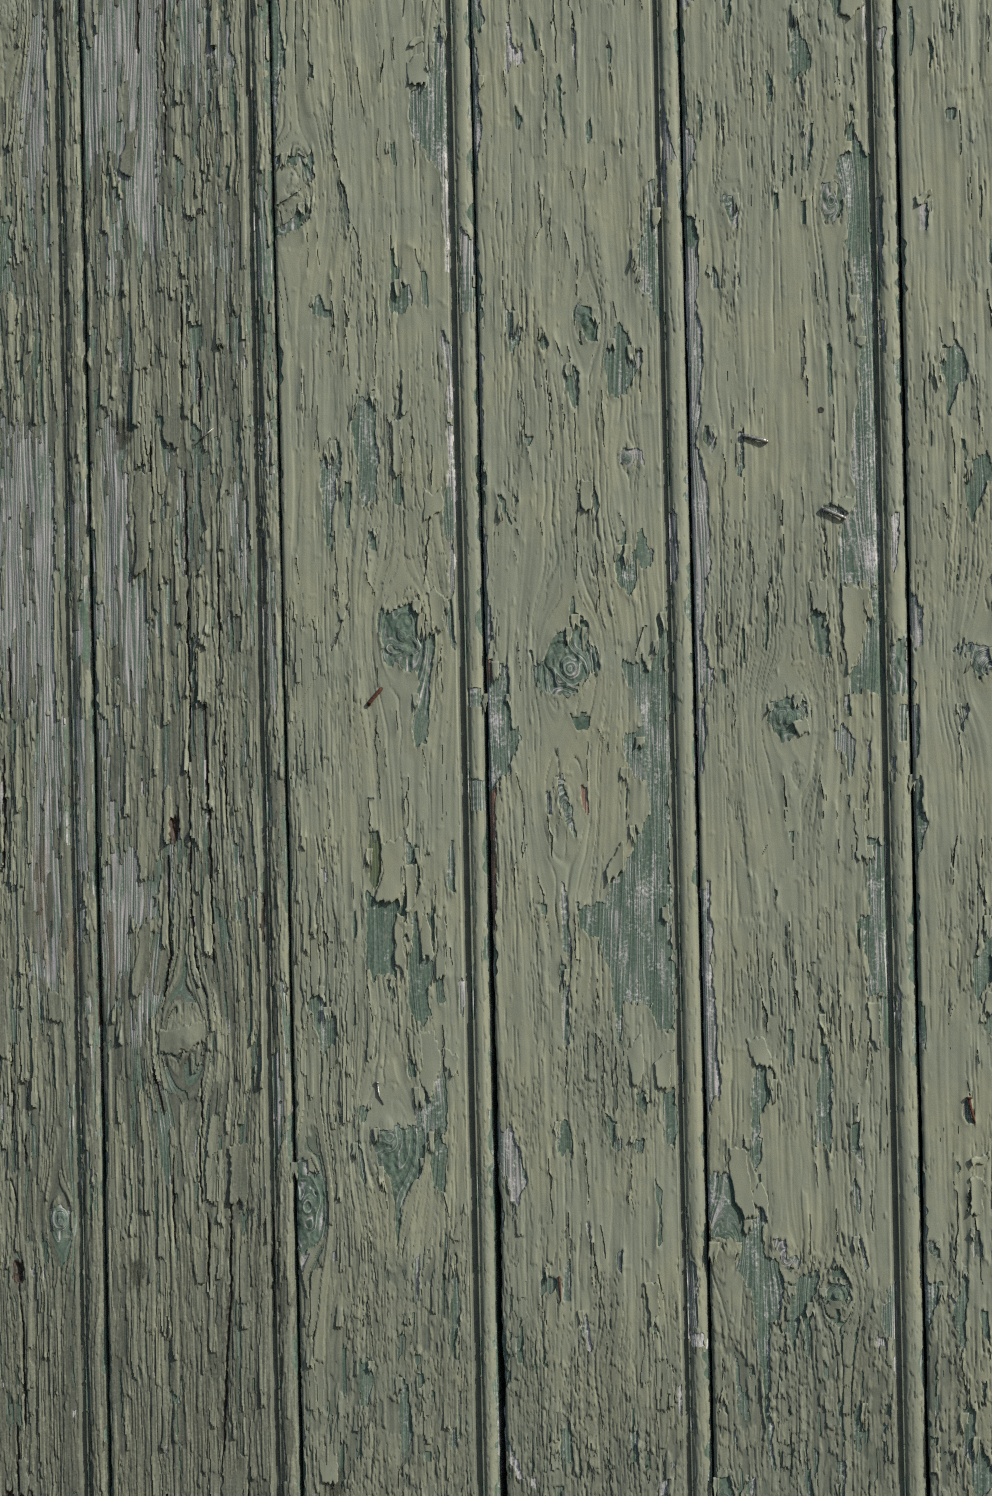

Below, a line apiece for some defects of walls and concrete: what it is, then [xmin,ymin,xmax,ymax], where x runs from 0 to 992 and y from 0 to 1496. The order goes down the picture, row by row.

crack [0,1,18,33]
peeling [765,70,773,110]
peeling [789,0,887,101]
peeling [565,596,591,652]
peeling [809,104,929,1051]
peeling [81,0,476,1496]
peeling [541,607,679,1149]
crack [161,1001,211,1062]
peeling [814,1004,834,1153]
peeling [498,1029,898,1496]
peeling [928,1381,992,1496]